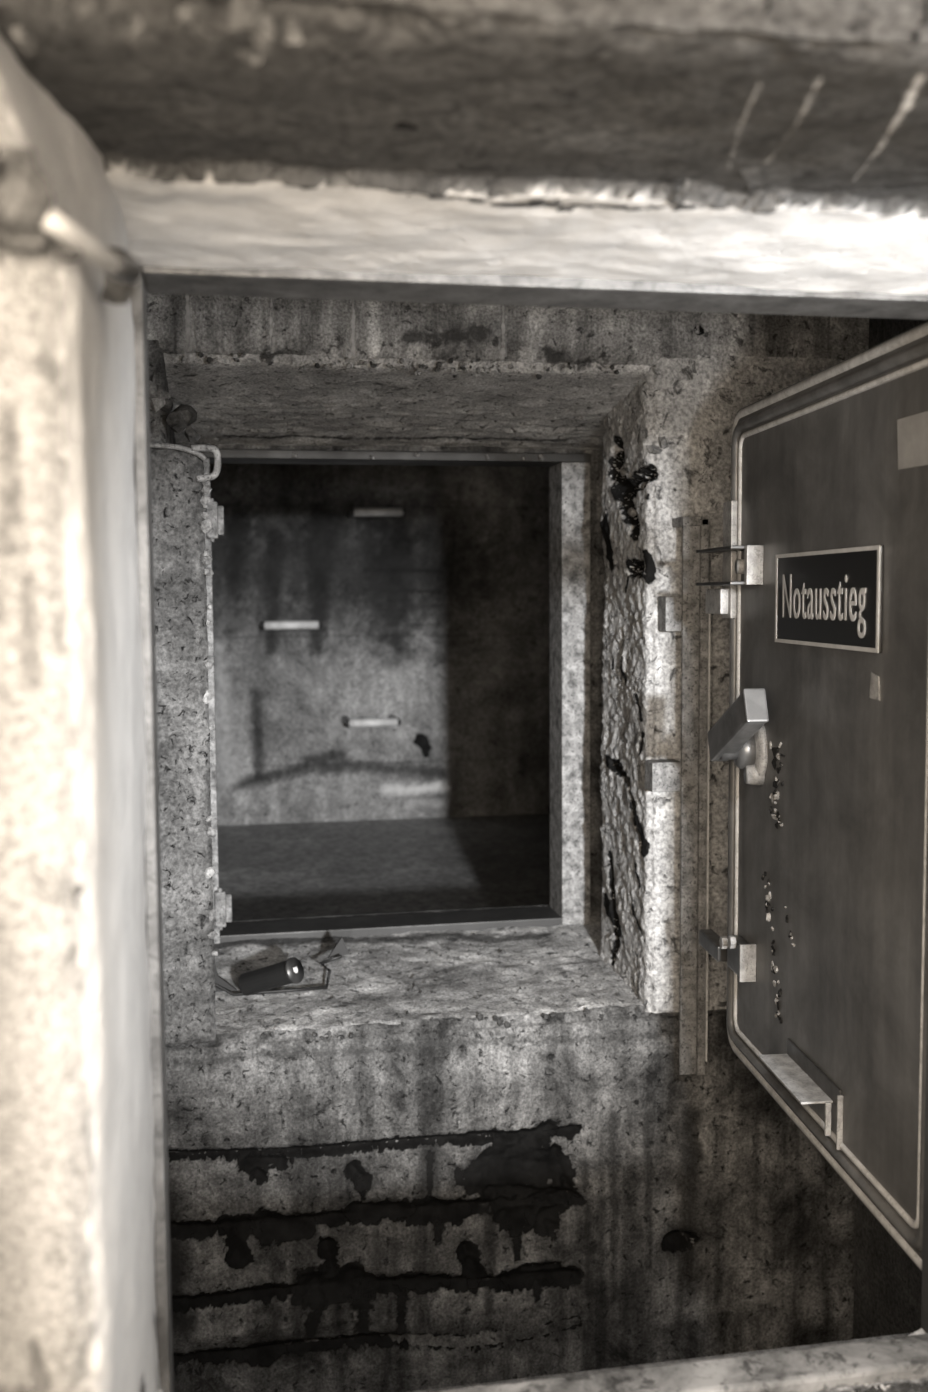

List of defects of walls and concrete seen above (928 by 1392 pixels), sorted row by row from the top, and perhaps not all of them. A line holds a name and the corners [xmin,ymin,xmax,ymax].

spalling [599,435,668,583]
flaking render [605,744,650,858]
flaking render [604,850,622,966]
damp [169,1192,496,1355]